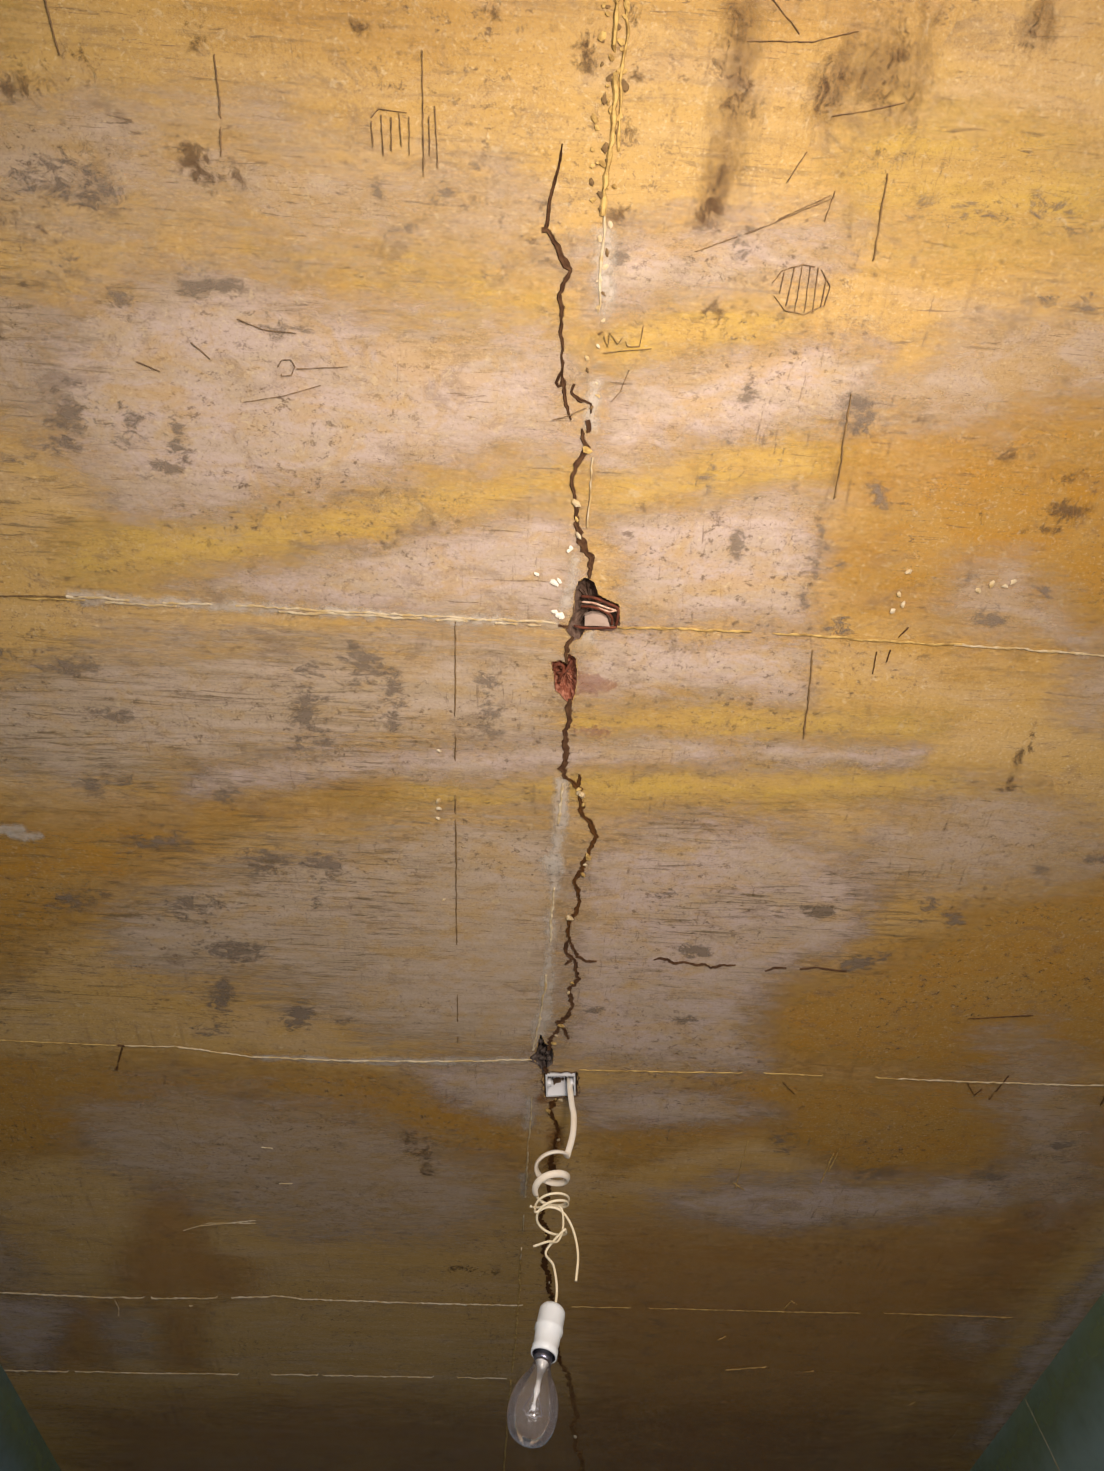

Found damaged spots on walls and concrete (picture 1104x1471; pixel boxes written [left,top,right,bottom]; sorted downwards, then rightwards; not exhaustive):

damp [700,169,724,222]
crack [542,144,595,579]
crack [538,624,599,1302]
crack [653,957,847,972]
crack [557,1346,585,1471]
damp [105,1143,1104,1471]